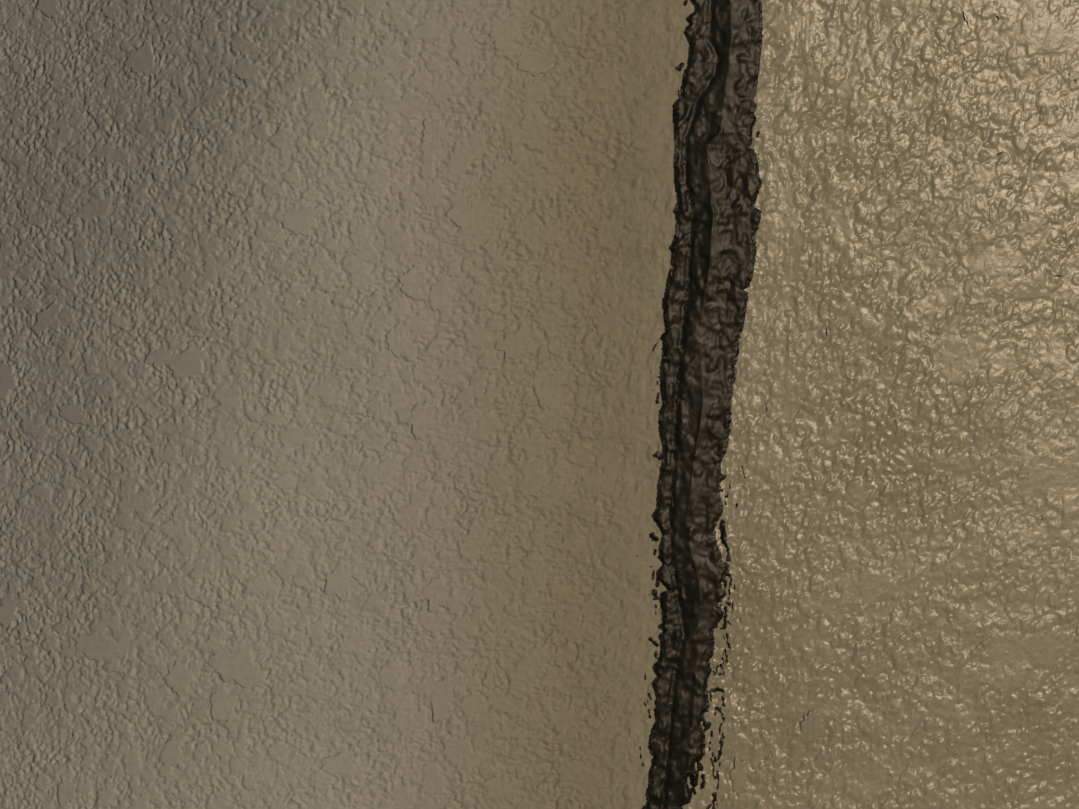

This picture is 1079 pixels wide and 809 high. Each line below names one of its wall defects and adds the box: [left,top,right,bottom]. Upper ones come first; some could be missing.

crack [637,0,763,809]